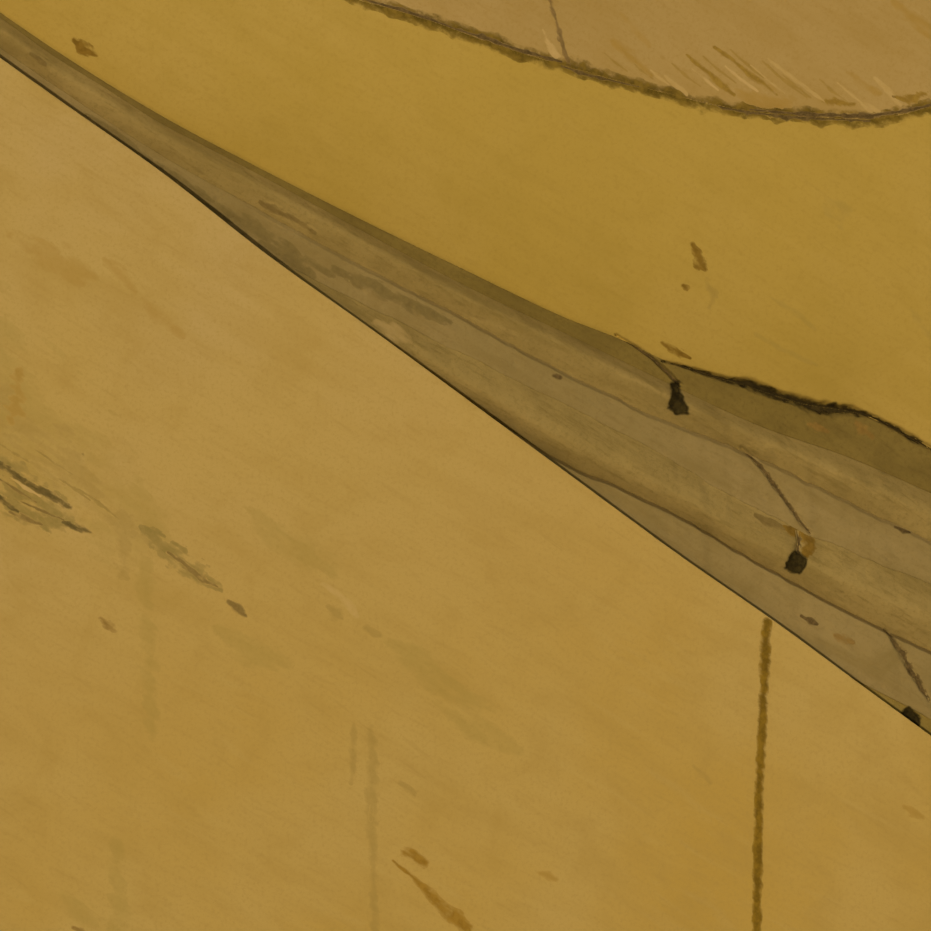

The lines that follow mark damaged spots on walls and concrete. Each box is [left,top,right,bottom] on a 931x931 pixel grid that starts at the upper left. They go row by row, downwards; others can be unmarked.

spalling [542,29,561,59]
crack [345,0,931,130]
flaking render [603,45,929,113]
crack [624,341,931,449]
water stain [0,313,172,743]
crack [745,453,812,555]
corrosion [753,513,817,558]
crack [882,628,931,703]